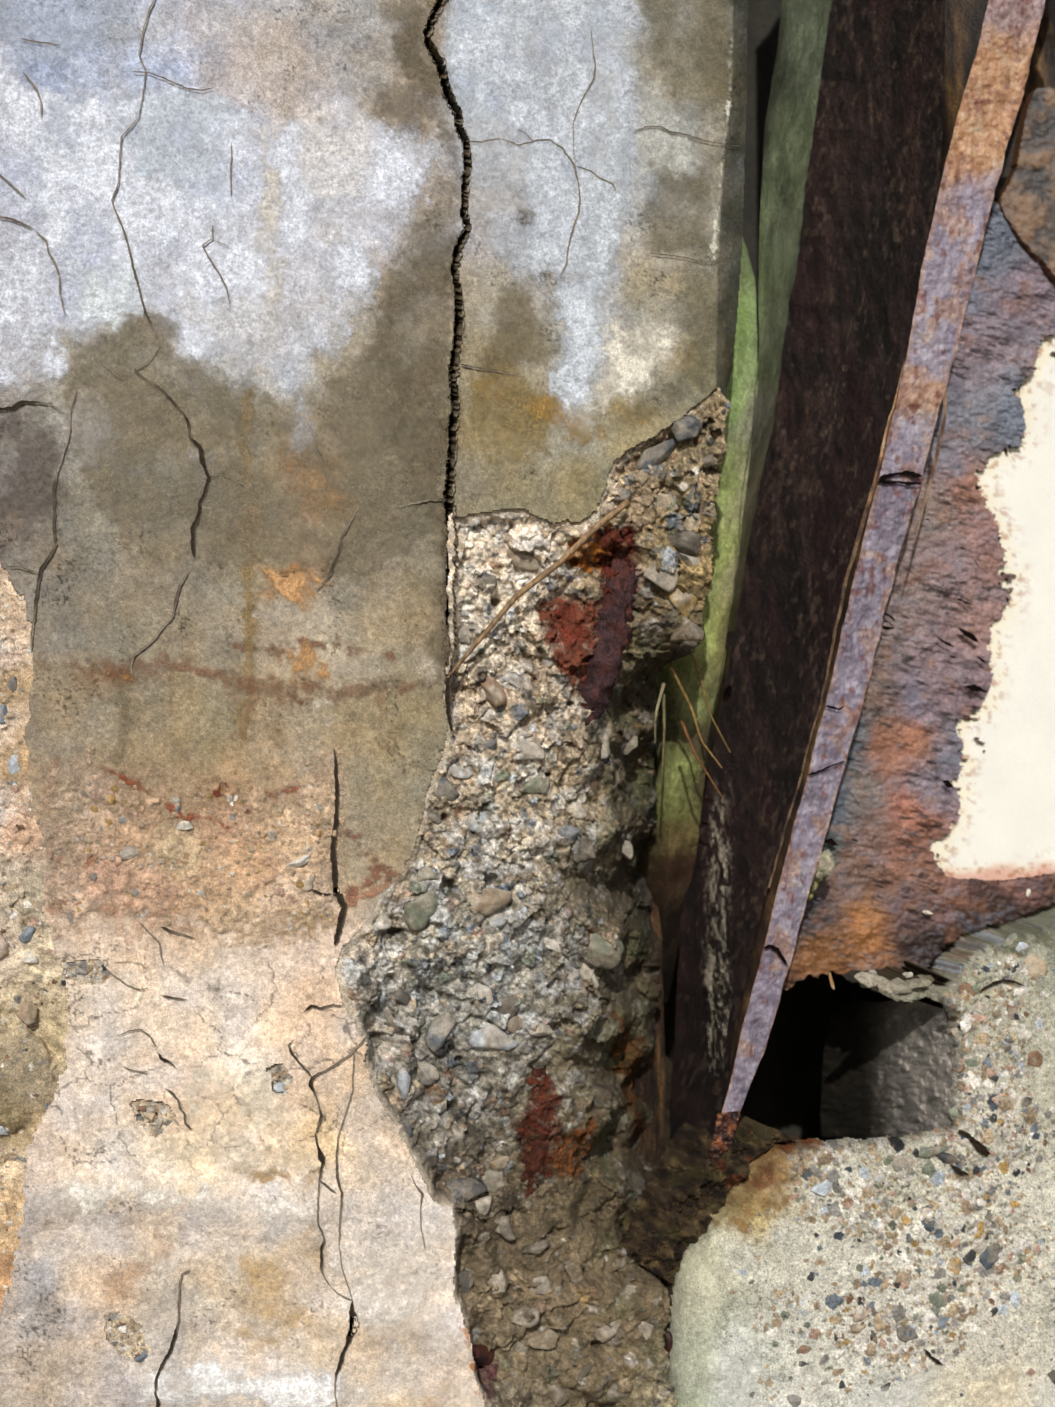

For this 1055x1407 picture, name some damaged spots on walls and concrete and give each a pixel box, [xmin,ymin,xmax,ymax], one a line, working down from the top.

crack [154,1270,191,1407]
spalling [0,562,346,1316]
water stain [0,59,456,683]
crack [288,1004,369,1407]
crack [312,749,347,945]
crack [316,0,617,732]
spalling [335,0,731,1407]
corrosion [512,1072,597,1178]
corrosion [535,521,639,707]
corrosion [768,356,907,888]
peeling [930,335,1055,897]